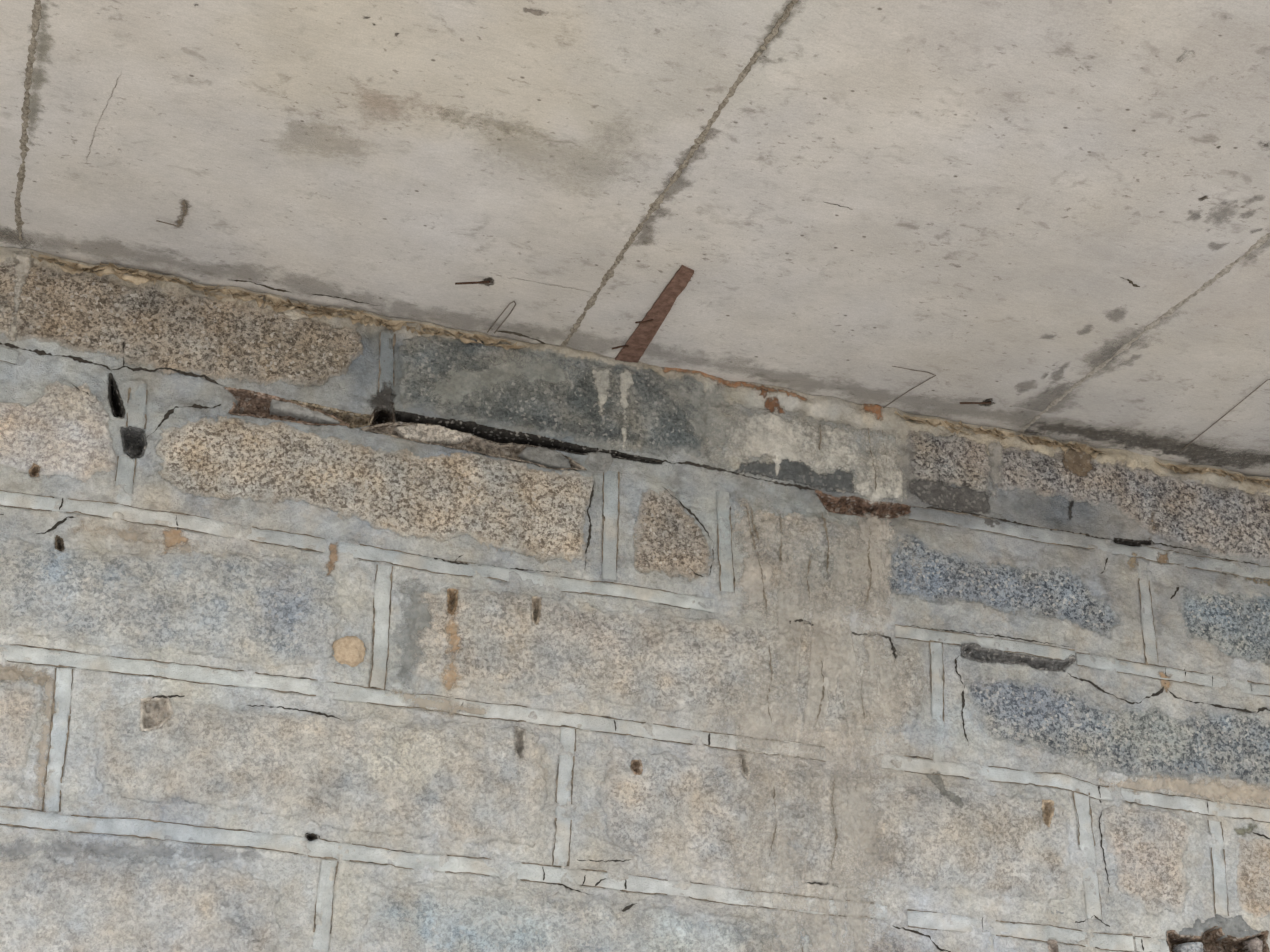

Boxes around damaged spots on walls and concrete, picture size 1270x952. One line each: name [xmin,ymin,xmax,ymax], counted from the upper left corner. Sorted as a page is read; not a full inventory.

crack [0,341,225,438]
crack [851,624,1270,746]
spalling [1172,942,1203,952]
spalling [1243,937,1263,952]